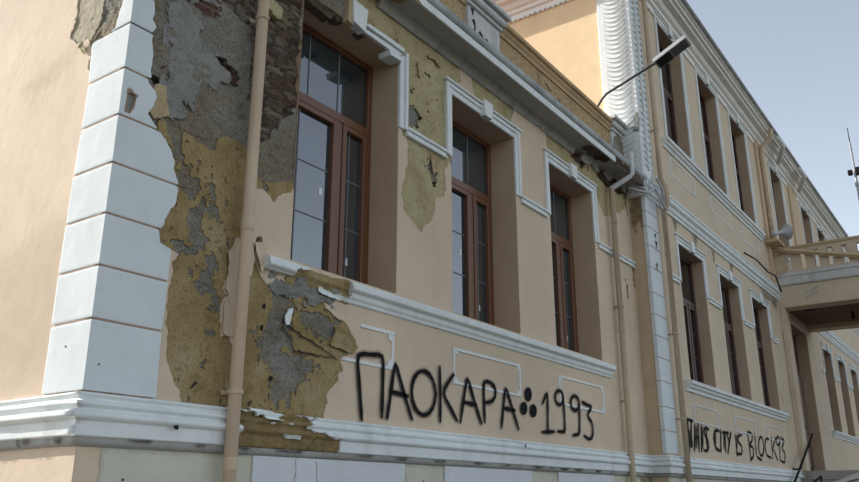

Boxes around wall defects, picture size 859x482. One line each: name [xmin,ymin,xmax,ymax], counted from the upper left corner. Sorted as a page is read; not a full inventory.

peeling [71,0,123,54]
flaking render [147,0,258,407]
flaking render [256,0,345,202]
peeling [356,0,513,232]
crack [470,7,488,41]
flaking render [545,134,617,217]
flaking render [241,242,358,440]